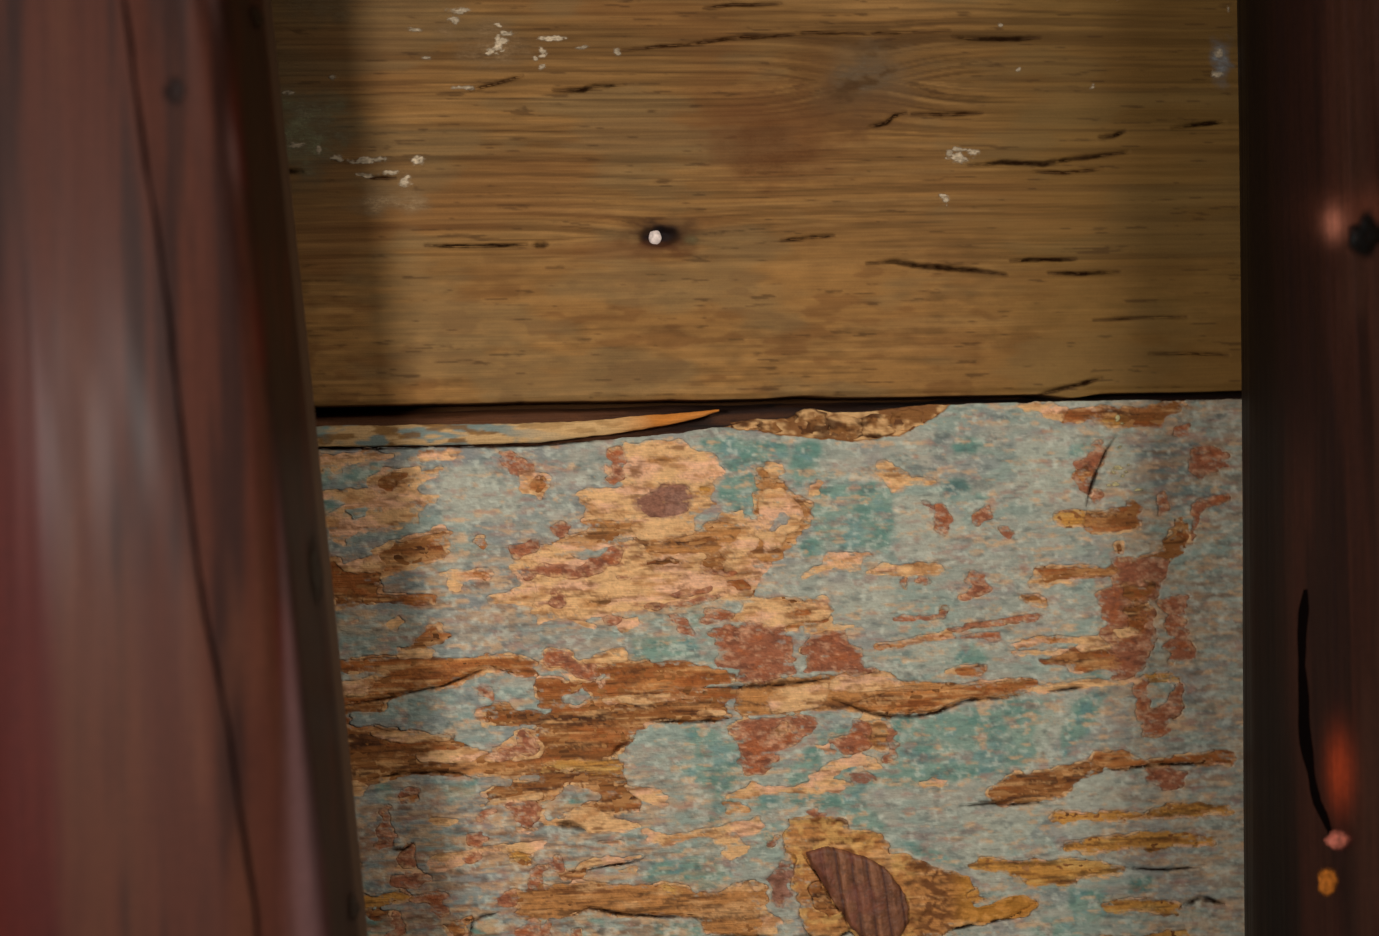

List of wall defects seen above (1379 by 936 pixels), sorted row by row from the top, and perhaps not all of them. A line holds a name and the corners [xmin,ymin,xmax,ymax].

spalling [728,408,936,440]
peeling [874,460,954,536]
peeling [972,504,1014,539]
spalling [1018,400,1231,554]
peeling [801,552,944,590]
peeling [319,438,905,936]
peeling [892,564,1185,738]
crack [1297,589,1333,834]
peeling [919,777,947,788]
peeling [1145,766,1188,791]